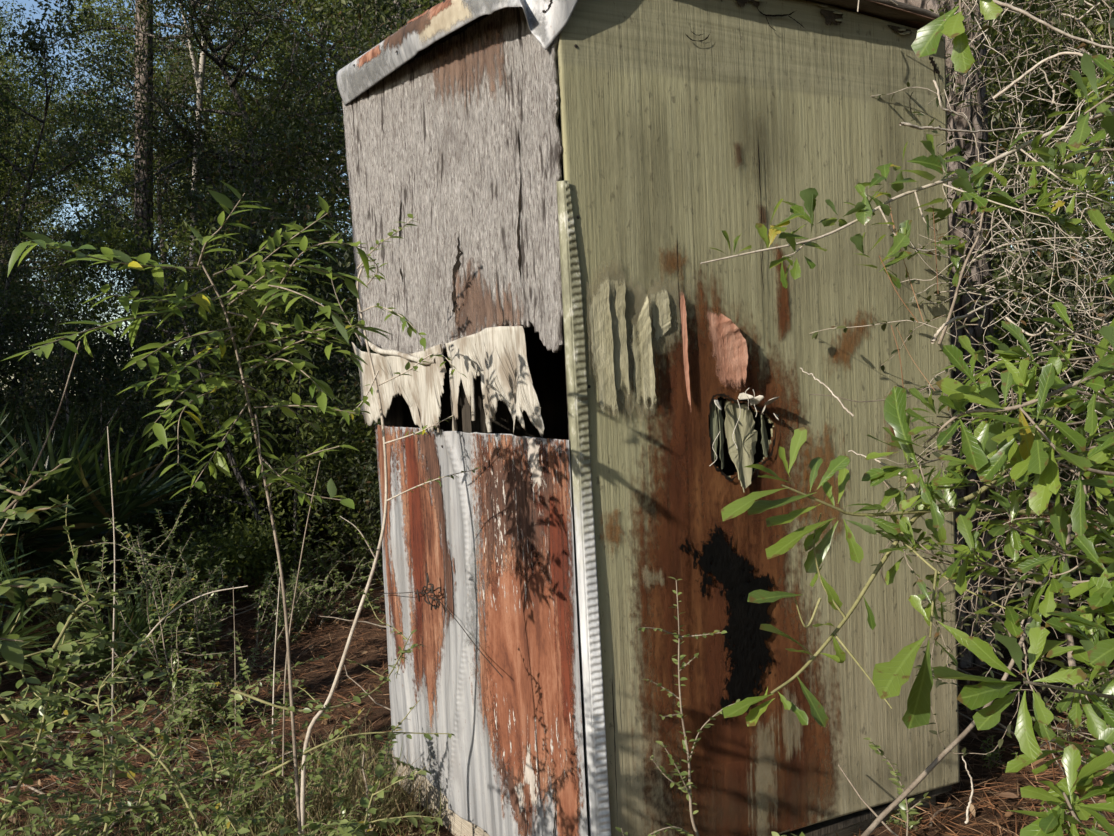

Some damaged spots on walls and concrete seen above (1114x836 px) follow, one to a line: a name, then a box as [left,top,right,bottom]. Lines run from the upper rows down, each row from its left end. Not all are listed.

rust [358,0,472,67]
rust [376,425,456,733]
rust [469,433,583,836]
rust [606,270,843,836]
peeling [738,392,779,421]
rust [775,245,790,338]